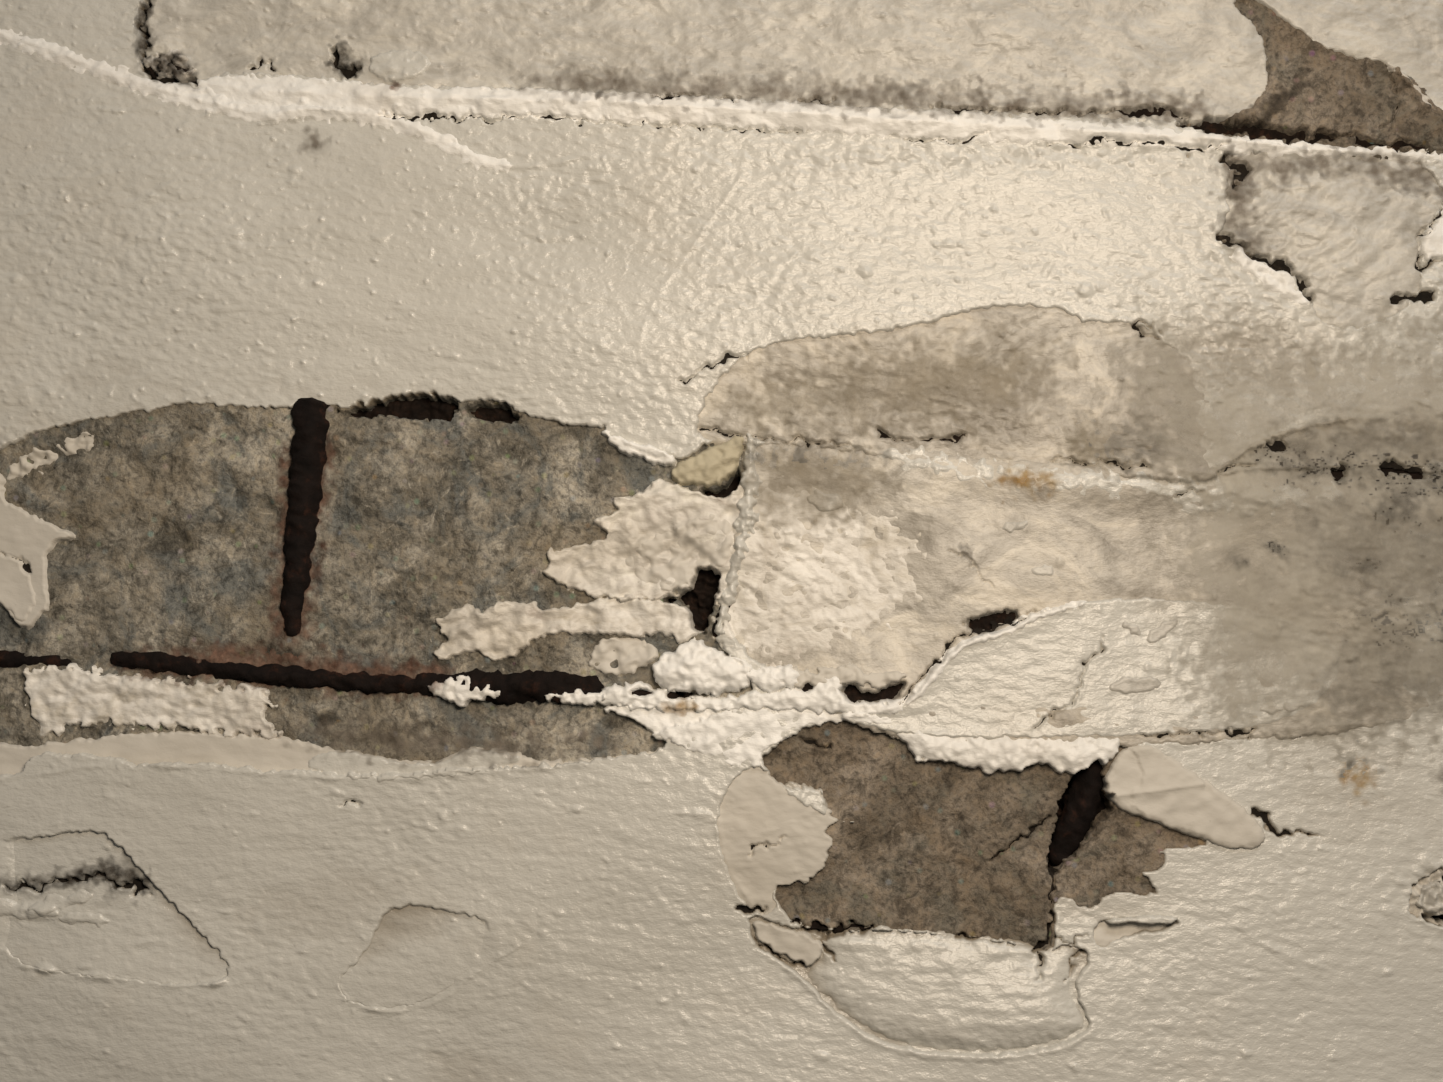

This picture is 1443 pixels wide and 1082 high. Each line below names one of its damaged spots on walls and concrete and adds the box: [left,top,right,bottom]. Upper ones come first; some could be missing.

crack [139,3,198,85]
crack [333,50,357,79]
crack [384,112,583,127]
peeling [139,0,1443,329]
crack [906,109,993,144]
crack [1028,107,1429,154]
water stain [883,347,1043,427]
crack [877,429,965,443]
crack [1224,441,1286,472]
rust [124,443,443,689]
water stain [1135,313,1443,739]
spalling [0,304,1443,1054]